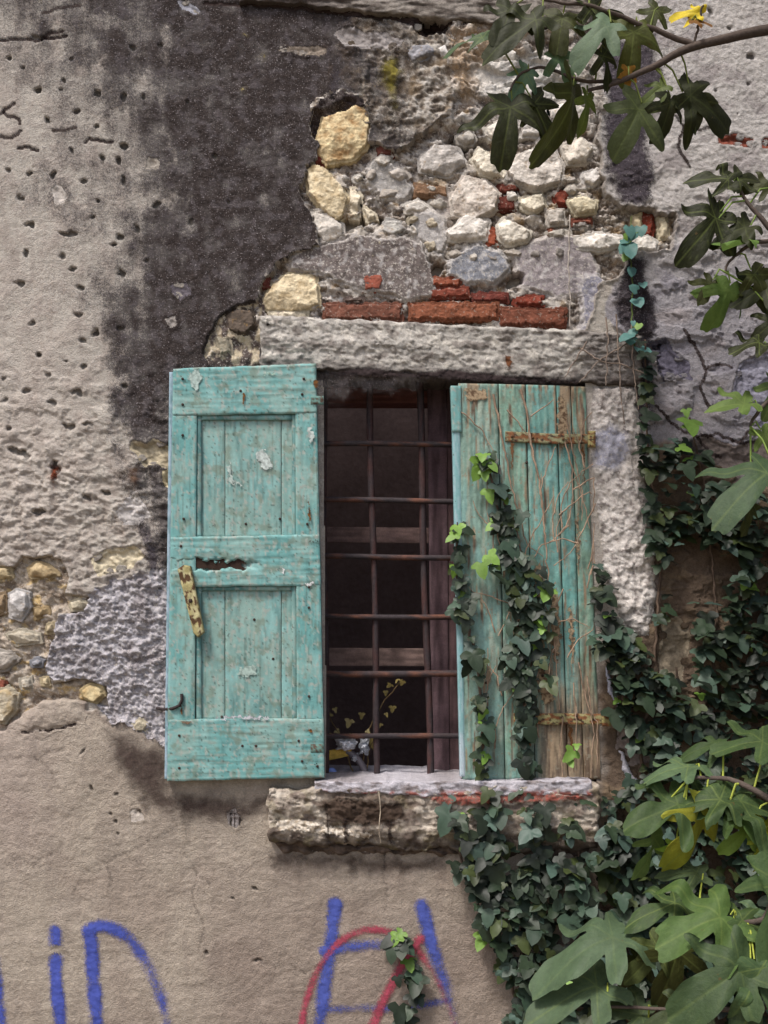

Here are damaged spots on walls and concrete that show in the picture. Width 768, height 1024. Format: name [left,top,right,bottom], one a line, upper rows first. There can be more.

water stain [0,0,418,596]
spalling [189,20,675,391]
crack [655,404,755,459]
crack [683,328,733,408]
spalling [0,545,167,746]
water stain [116,737,265,817]